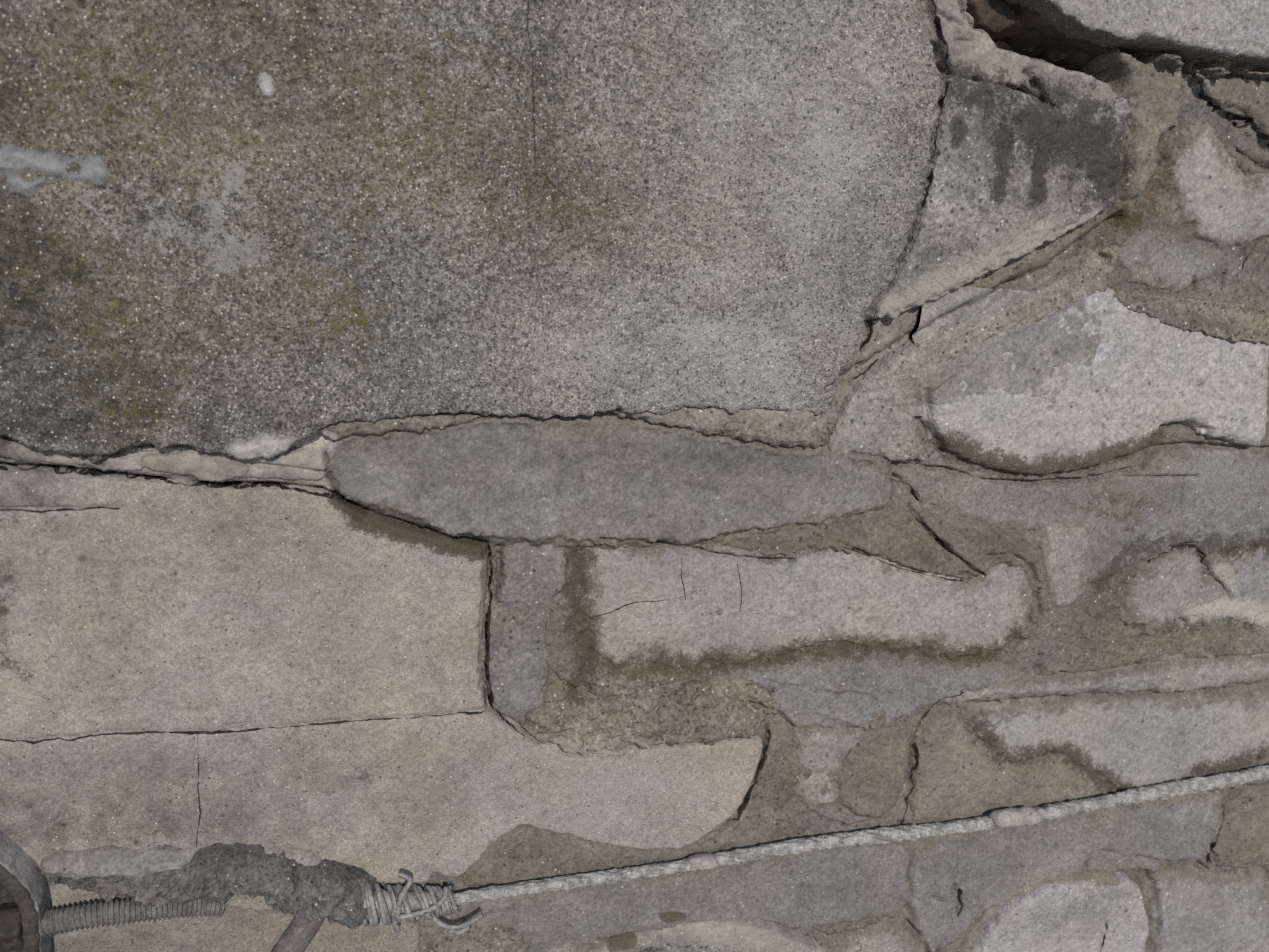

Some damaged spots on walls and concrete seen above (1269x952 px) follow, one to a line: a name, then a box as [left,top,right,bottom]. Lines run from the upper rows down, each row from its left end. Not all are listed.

crack [921,0,949,208]
crack [853,316,880,379]
crack [0,542,525,847]